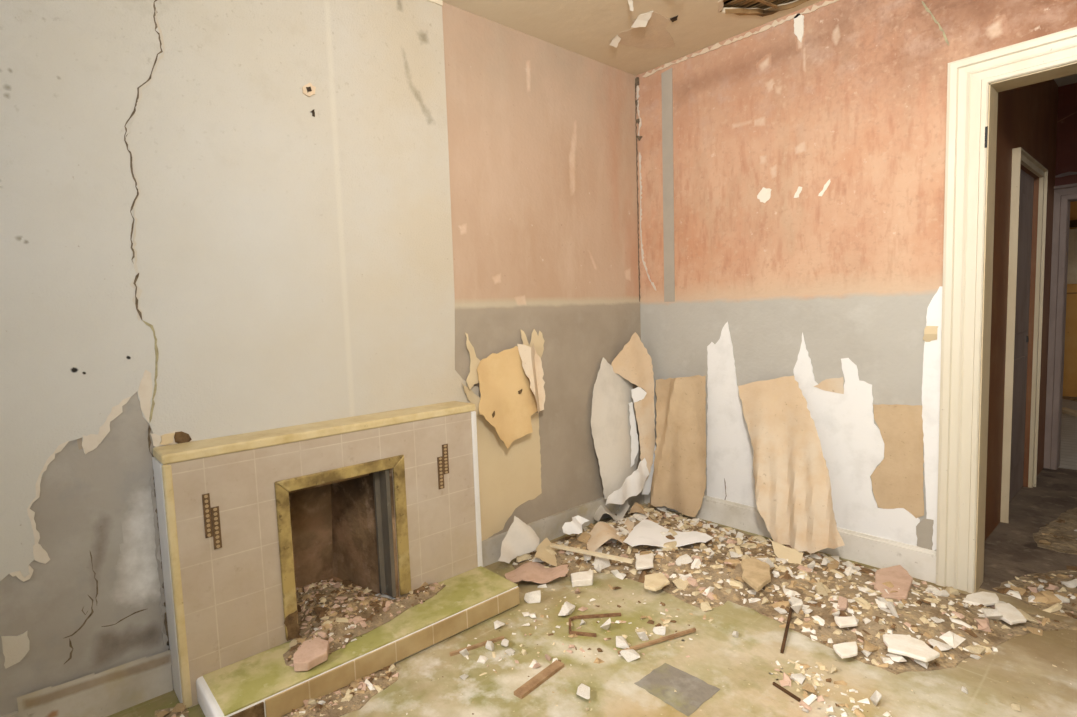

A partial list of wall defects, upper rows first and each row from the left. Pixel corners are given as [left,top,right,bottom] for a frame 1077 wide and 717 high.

peeling [610,0,678,49]
spalling [718,0,809,17]
peeling [0,370,192,717]
crack [63,0,170,664]
damp [77,473,167,678]
peeling [916,286,943,550]